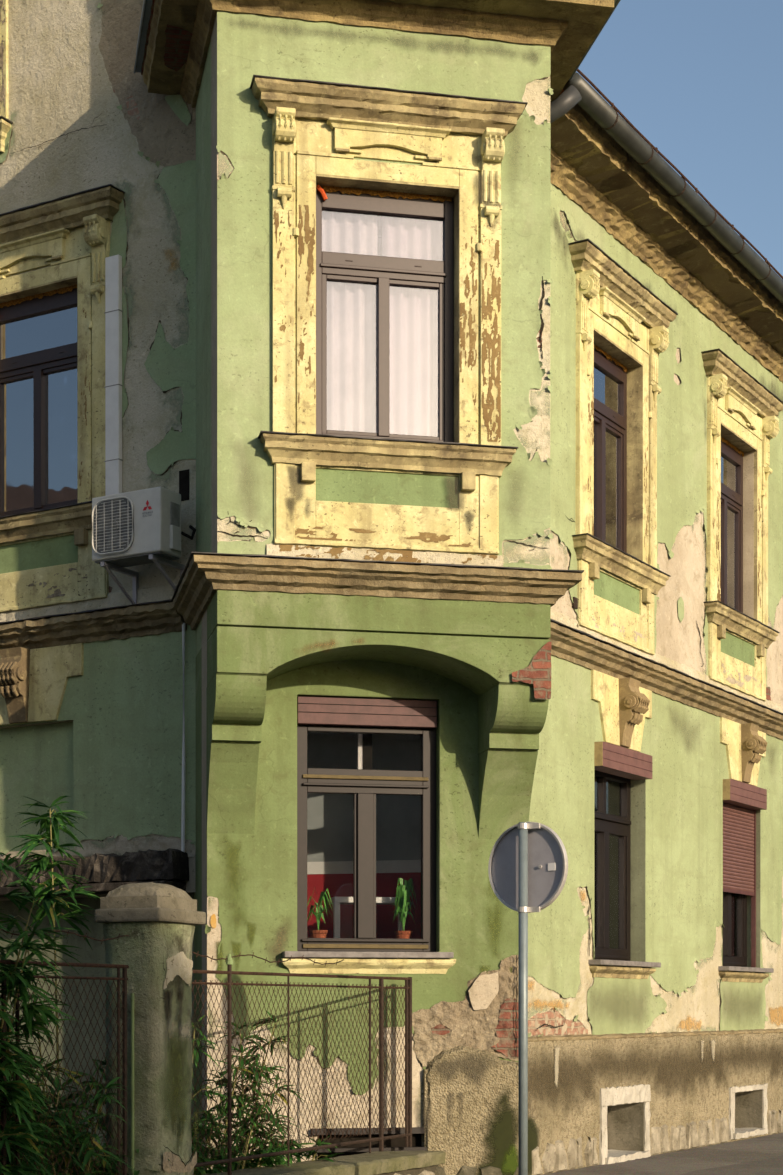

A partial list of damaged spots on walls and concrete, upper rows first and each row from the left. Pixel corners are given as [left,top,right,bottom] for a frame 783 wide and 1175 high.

peeling [0,0,196,593]
peeling [216,146,234,182]
peeling [273,204,316,417]
peeling [460,226,553,467]
peeling [522,77,783,356]
peeling [217,516,572,570]
peeling [551,590,577,620]
peeling [592,446,721,674]